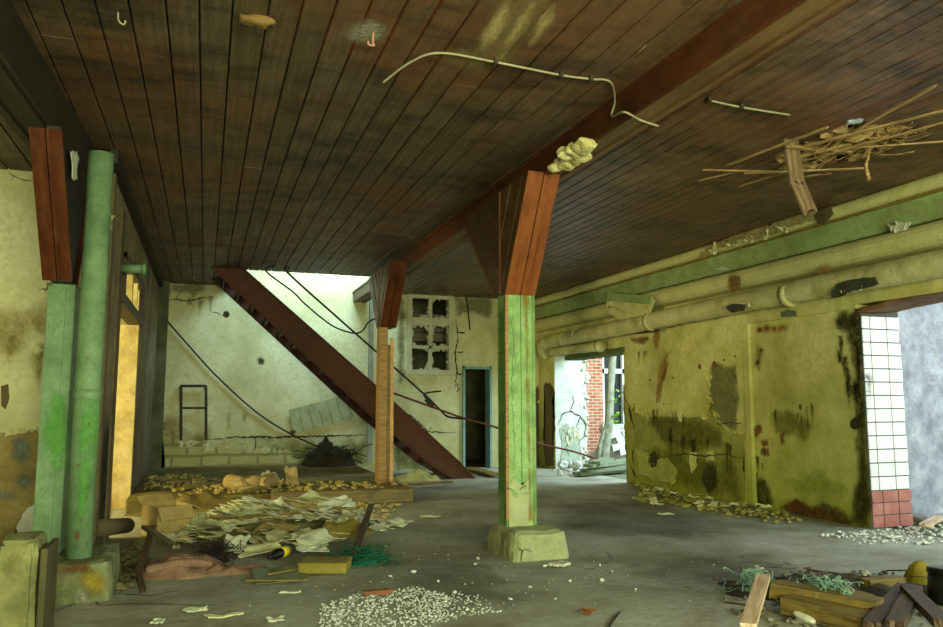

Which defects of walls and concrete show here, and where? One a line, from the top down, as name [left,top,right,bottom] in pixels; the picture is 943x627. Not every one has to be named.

water stain [482,3,552,60]
corrosion [729,276,740,292]
spalling [1,384,9,409]
crack [454,323,465,392]
crack [558,396,587,452]
corrosion [657,354,667,401]
peeling [623,360,746,502]
water stain [652,410,739,500]
crack [668,422,742,479]
water stain [783,312,873,527]